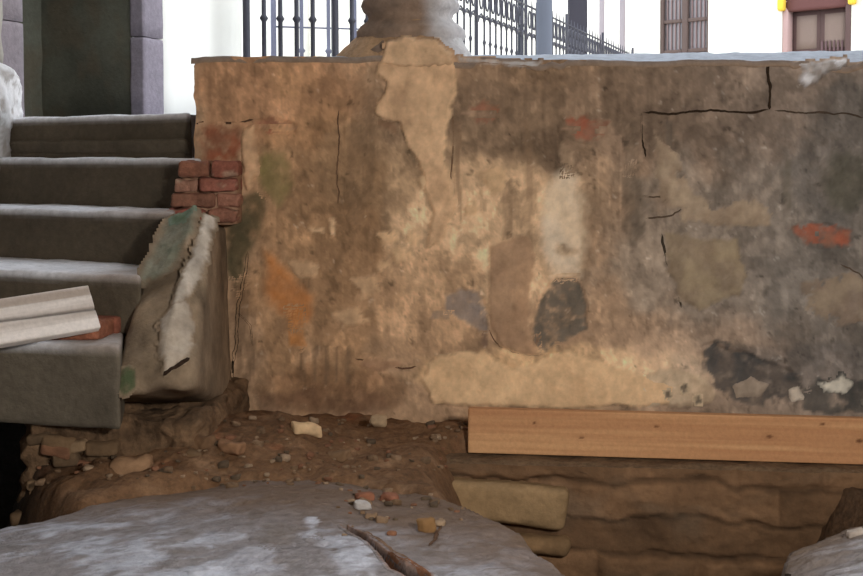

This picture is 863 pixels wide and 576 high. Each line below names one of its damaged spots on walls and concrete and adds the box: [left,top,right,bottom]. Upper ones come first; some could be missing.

crack [641,66,863,157]
peeling [329,35,544,331]
peeling [137,114,299,378]
peeling [287,255,323,280]
crack [337,524,437,576]
crack [429,525,442,546]